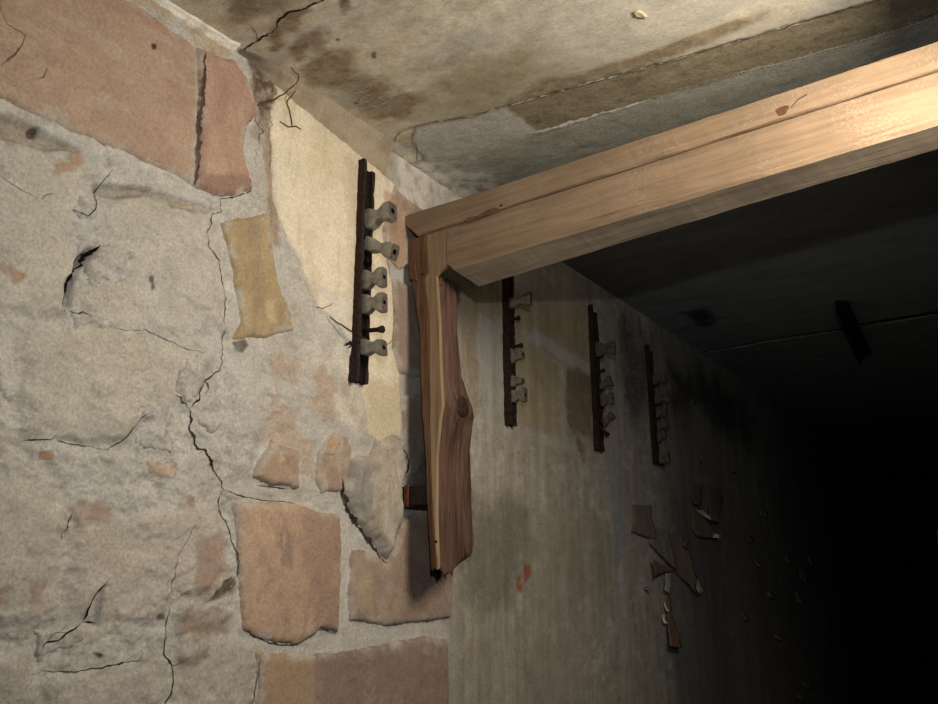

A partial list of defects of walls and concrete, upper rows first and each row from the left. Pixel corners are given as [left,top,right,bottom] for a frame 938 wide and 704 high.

crack [0,7,26,66]
crack [243,0,324,50]
damp [307,52,415,118]
damp [510,20,747,104]
flaking render [395,0,938,198]
crack [255,107,273,167]
spalling [73,242,137,290]
crack [178,185,291,580]
peeling [632,504,656,539]
crack [42,526,196,704]